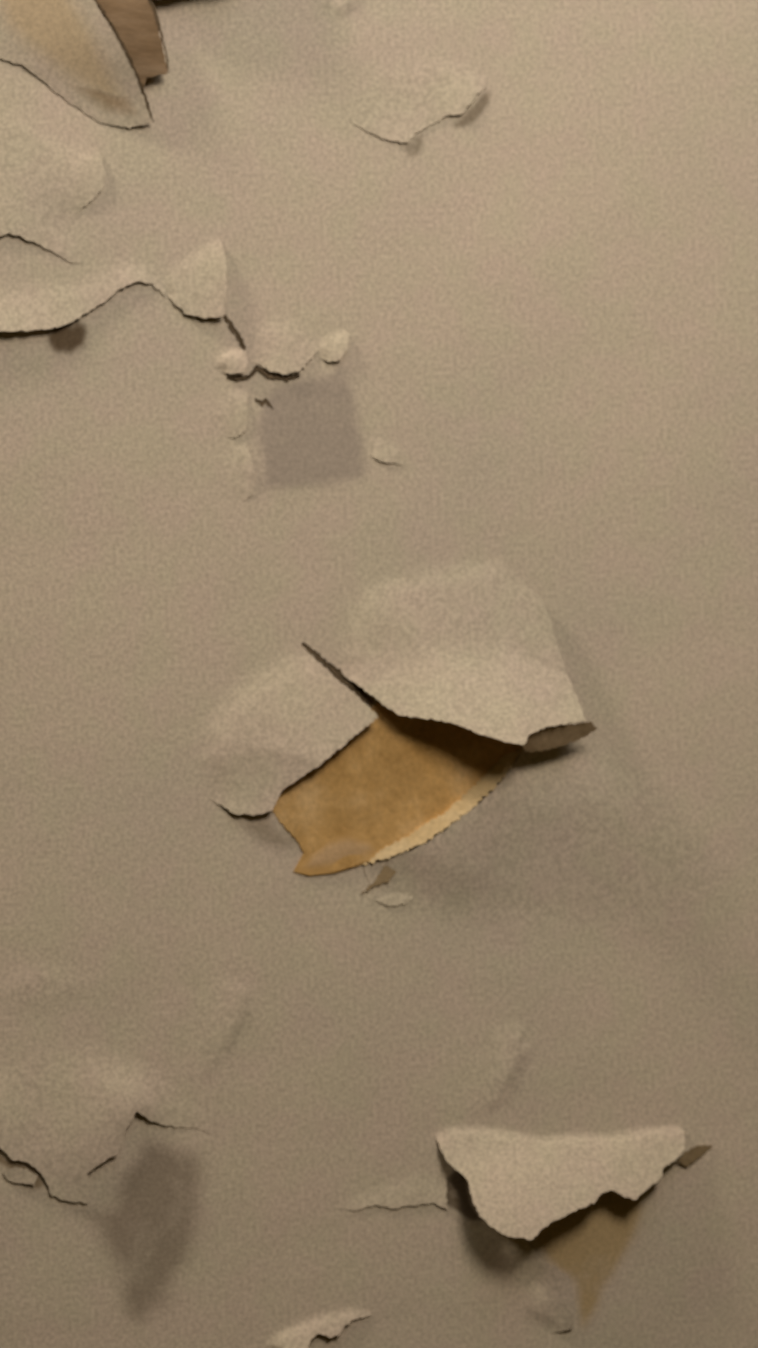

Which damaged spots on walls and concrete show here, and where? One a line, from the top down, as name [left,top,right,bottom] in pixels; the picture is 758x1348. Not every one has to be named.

peeling [0,0,169,129]
peeling [343,46,495,164]
peeling [0,100,227,362]
spalling [206,308,403,505]
peeling [189,554,756,947]
peeling [0,1036,222,1348]
peeling [262,1304,371,1348]
peeling [336,1122,712,1341]